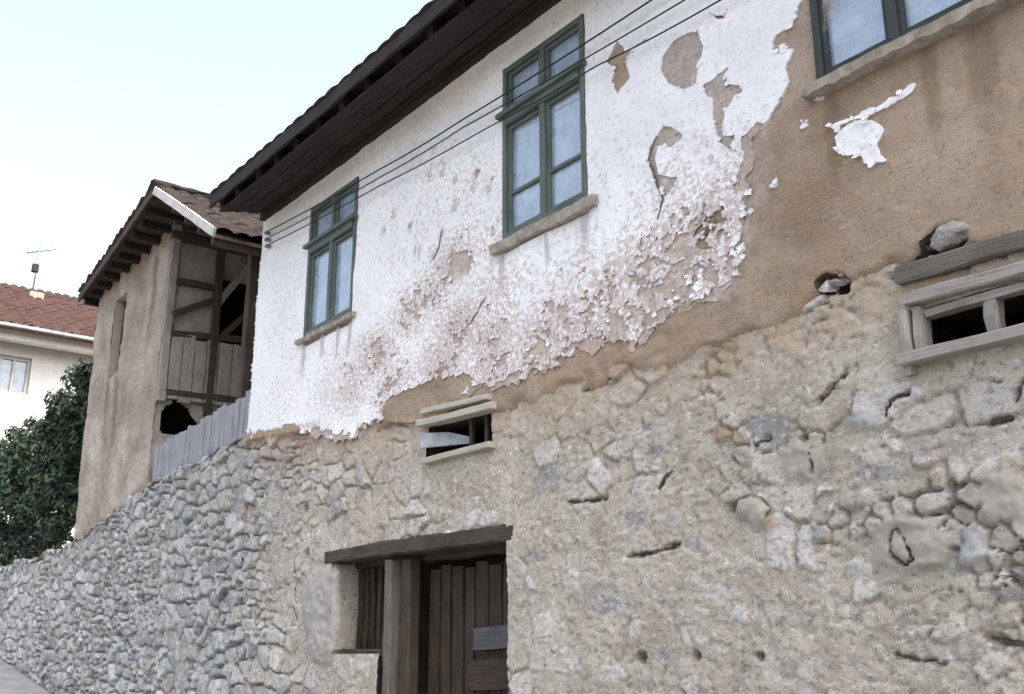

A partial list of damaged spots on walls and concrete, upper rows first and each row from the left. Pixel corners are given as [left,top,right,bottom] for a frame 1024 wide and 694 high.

crack [647,136,664,219]
peeling [310,0,810,442]
spalling [915,220,974,260]
spalling [814,271,851,296]
crack [820,375,847,402]
crack [885,393,910,416]
crack [658,471,673,489]
crack [567,496,603,504]
crack [627,543,681,558]
crack [888,528,914,567]